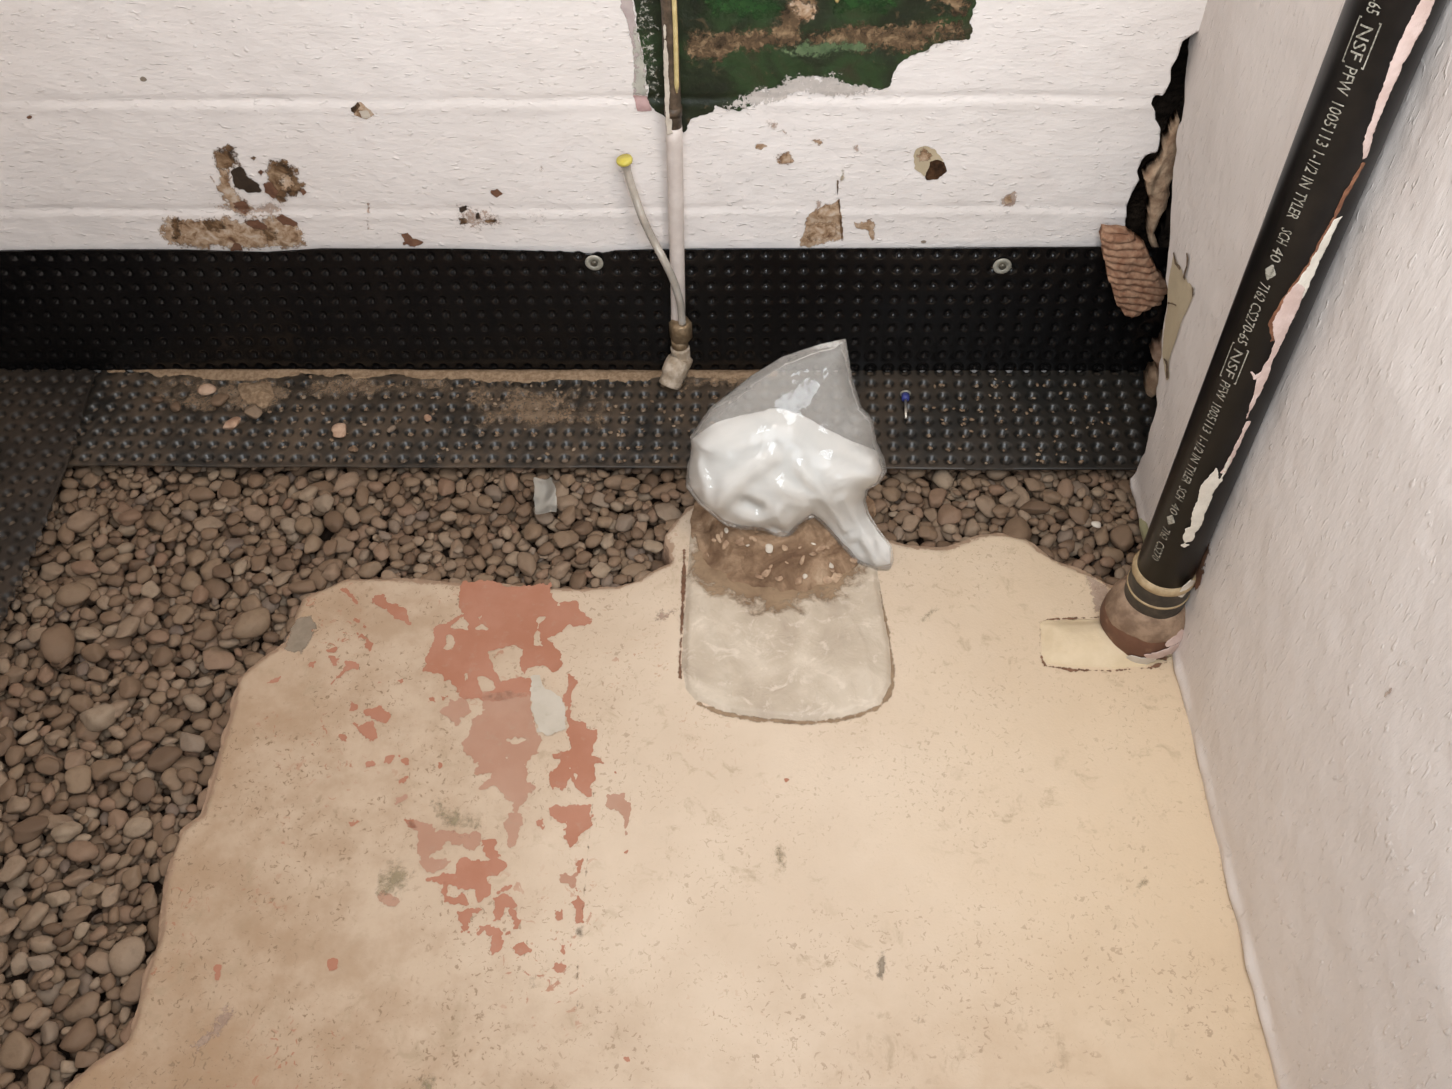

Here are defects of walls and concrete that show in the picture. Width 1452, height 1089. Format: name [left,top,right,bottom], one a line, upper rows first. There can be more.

peeling [620,0,976,135]
spalling [913,146,947,180]
peeling [800,180,875,248]
peeling [1162,252,1194,380]
peeling [307,588,411,685]
peeling [338,701,391,742]
peeling [365,580,631,956]
peeling [552,945,567,973]